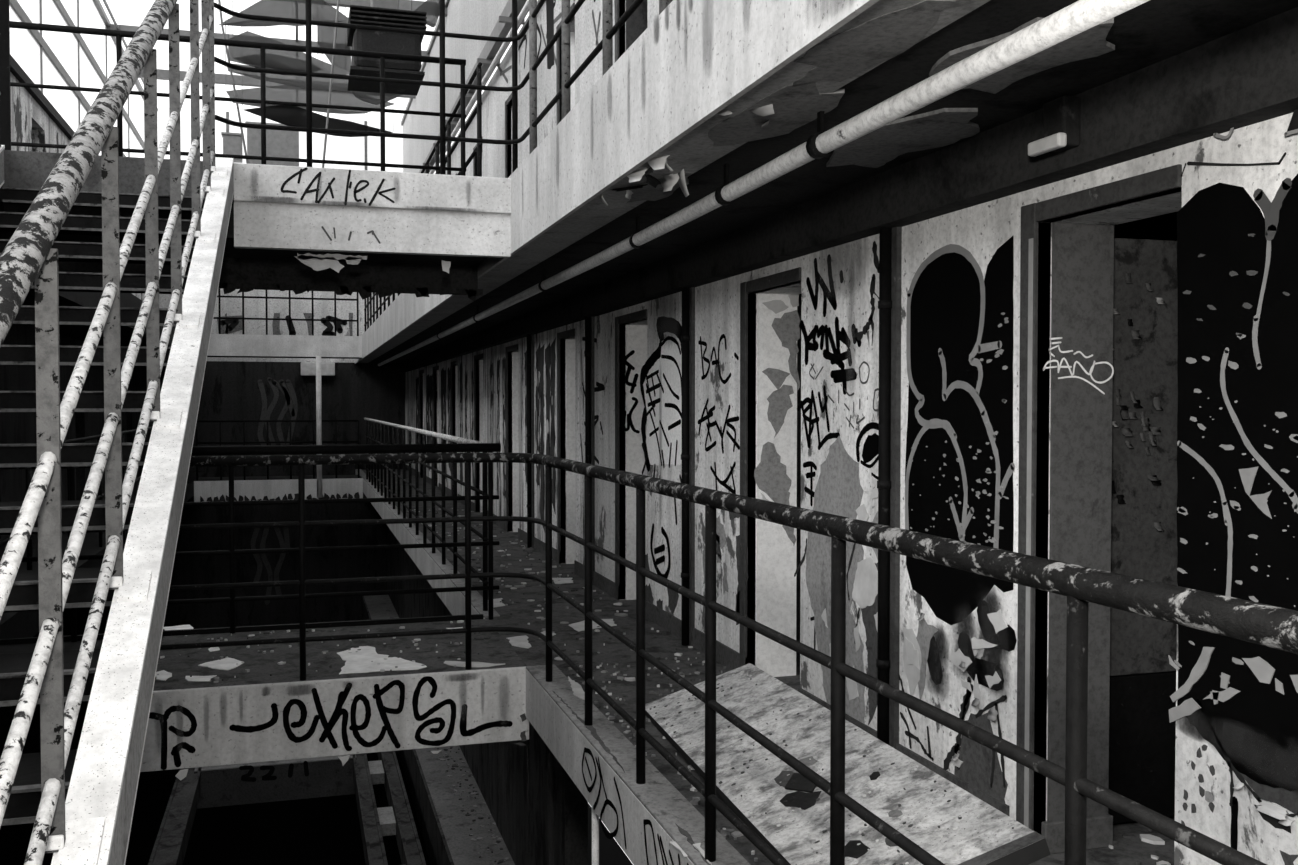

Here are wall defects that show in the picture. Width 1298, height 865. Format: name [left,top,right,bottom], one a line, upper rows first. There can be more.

peeling [1284,109,1298,136]
peeling [1190,389,1238,438]
peeling [1208,412,1298,537]
peeling [1235,534,1270,602]
peeling [903,613,938,700]
peeling [949,609,1008,804]
peeling [1168,641,1298,723]